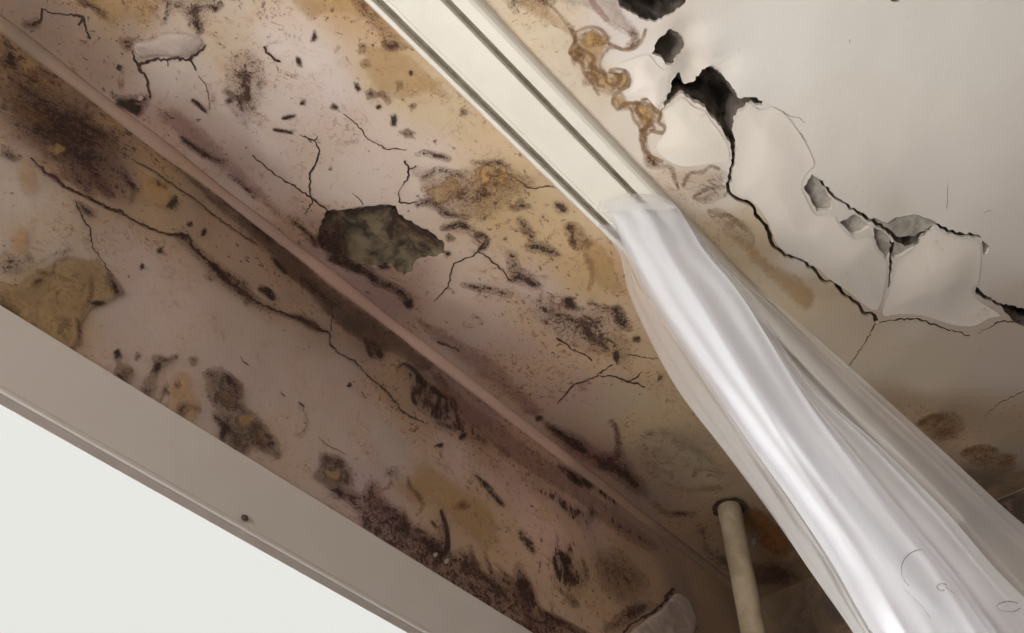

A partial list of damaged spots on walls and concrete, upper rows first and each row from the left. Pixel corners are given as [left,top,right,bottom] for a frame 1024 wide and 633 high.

spalling [0,256,124,349]
crack [131,45,210,110]
crack [30,157,424,423]
crack [252,135,328,214]
water stain [175,167,510,458]
spalling [318,205,445,274]
water stain [290,150,639,368]
water stain [508,0,666,169]
hole [618,0,686,21]
hole [653,29,762,159]
crack [726,155,1021,369]
water stain [315,452,596,633]